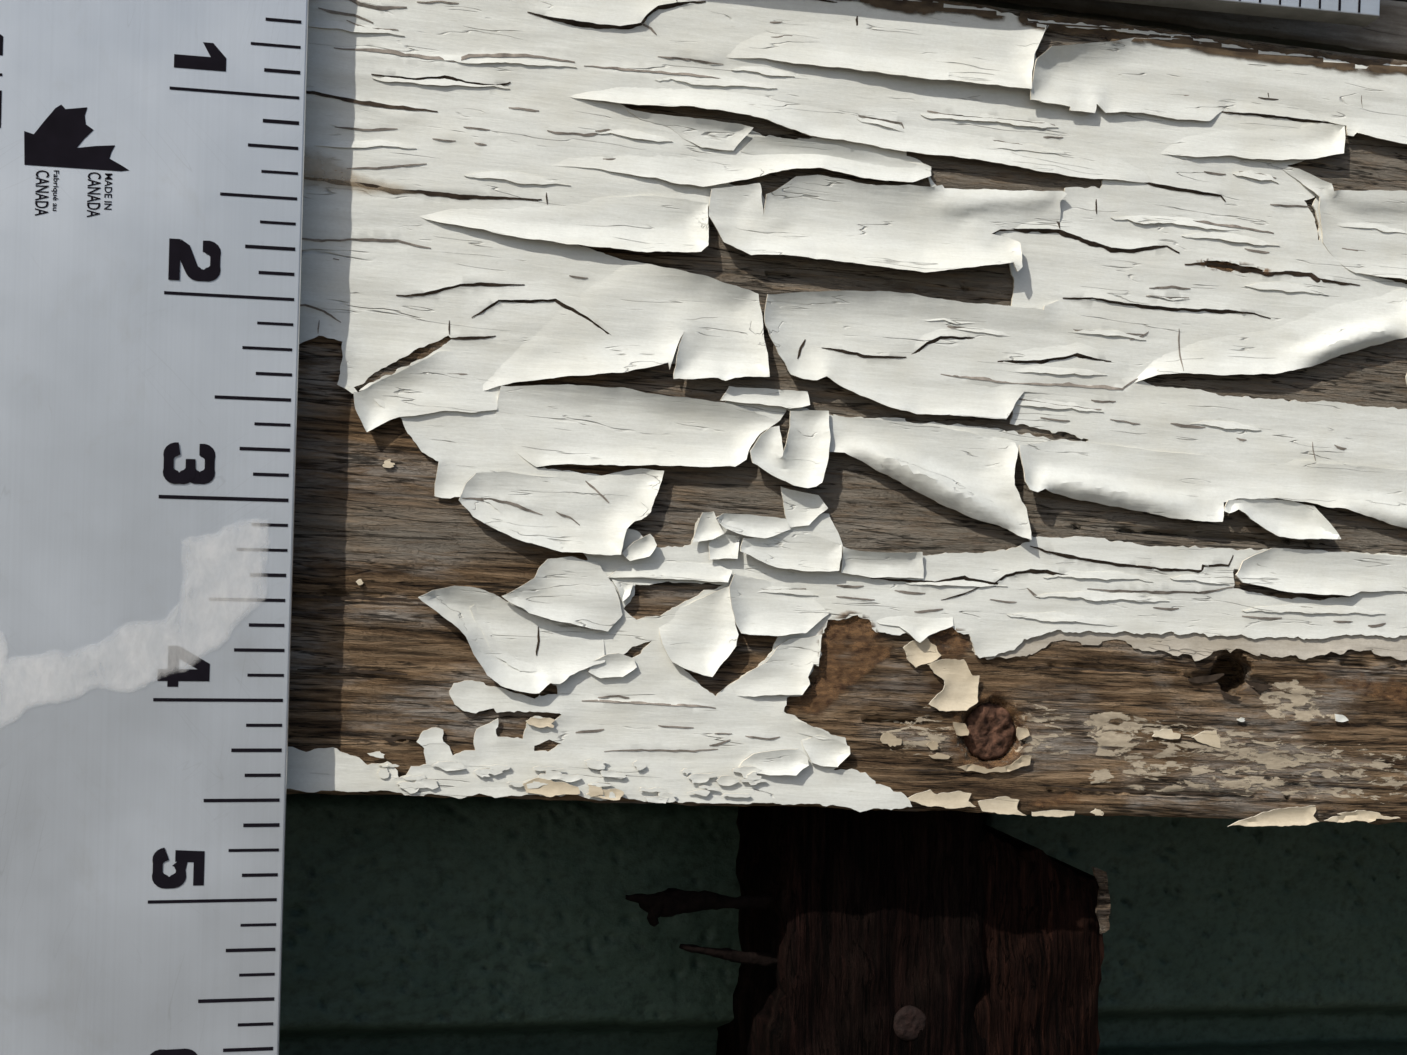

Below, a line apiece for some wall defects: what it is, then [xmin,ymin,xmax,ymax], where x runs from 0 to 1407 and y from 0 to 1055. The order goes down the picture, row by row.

peeling [353,18,1407,697]
peeling [526,717,555,728]
peeling [953,722,969,736]
rust [951,694,1027,767]
peeling [1016,727,1030,741]
peeling [1152,729,1181,739]
peeling [926,741,951,759]
peeling [367,719,850,803]
peeling [1088,769,1114,784]
peeling [1214,776,1288,790]
peeling [978,796,1104,817]
peeling [1324,810,1400,823]